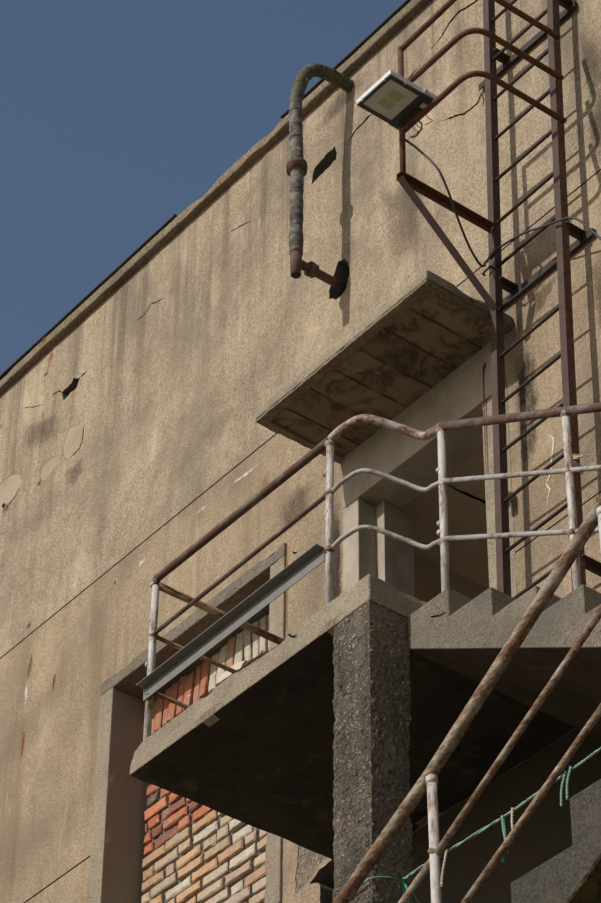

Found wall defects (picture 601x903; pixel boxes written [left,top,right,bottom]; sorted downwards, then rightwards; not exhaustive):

crack [434,0,478,45]